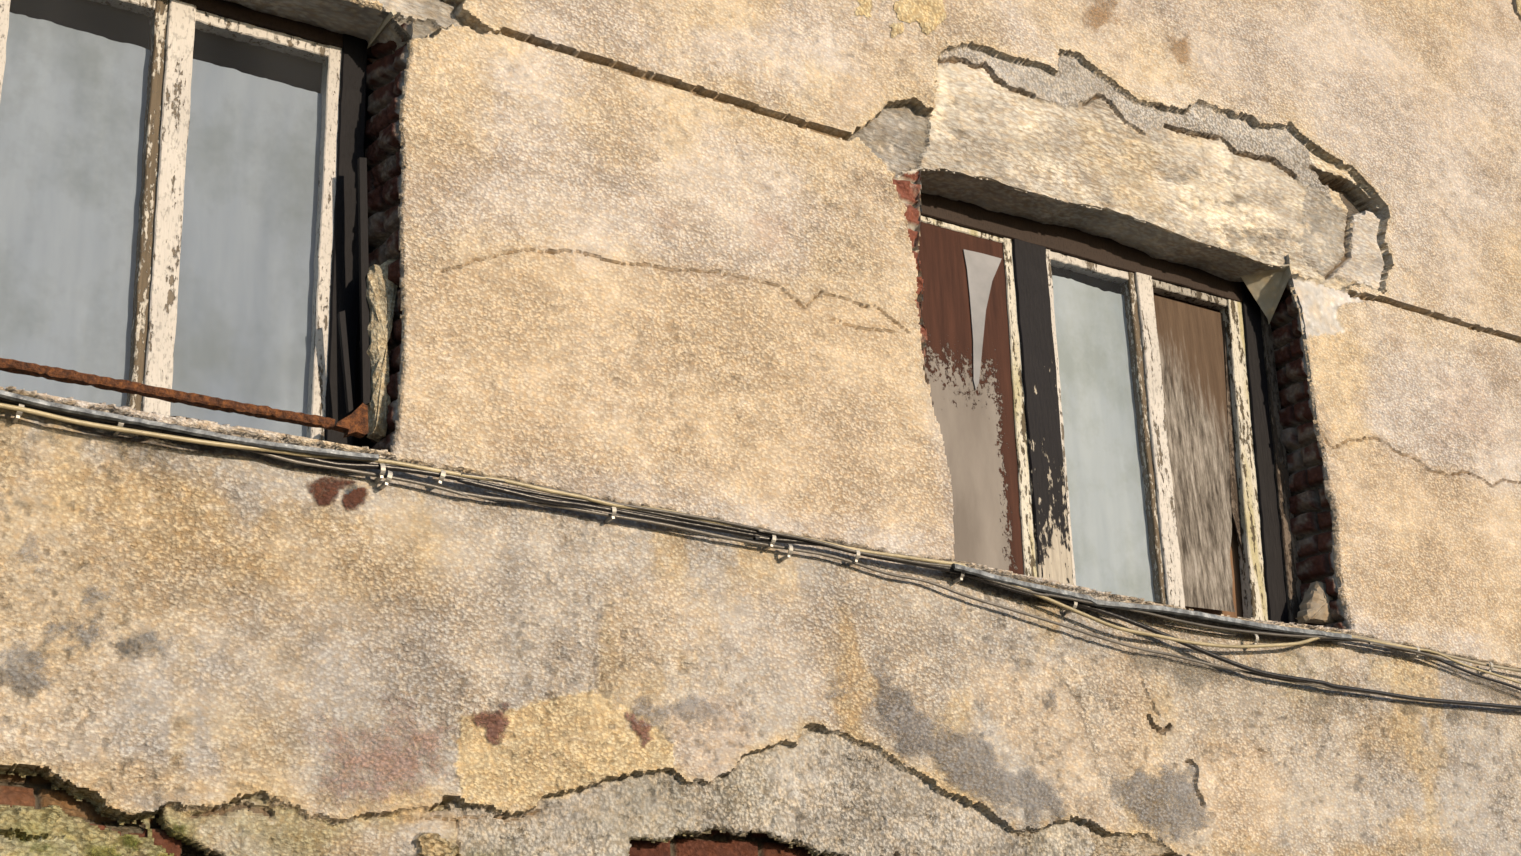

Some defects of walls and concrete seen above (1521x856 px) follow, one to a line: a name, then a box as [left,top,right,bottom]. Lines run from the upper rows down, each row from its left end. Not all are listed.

peeling [890,0,947,38]
flaking render [365,0,500,452]
crack [441,247,911,334]
spalling [849,41,1394,629]
rust [0,358,368,438]
rust [309,476,368,511]
crack [1320,430,1521,488]
damp [326,712,442,799]
spalling [0,723,1191,856]